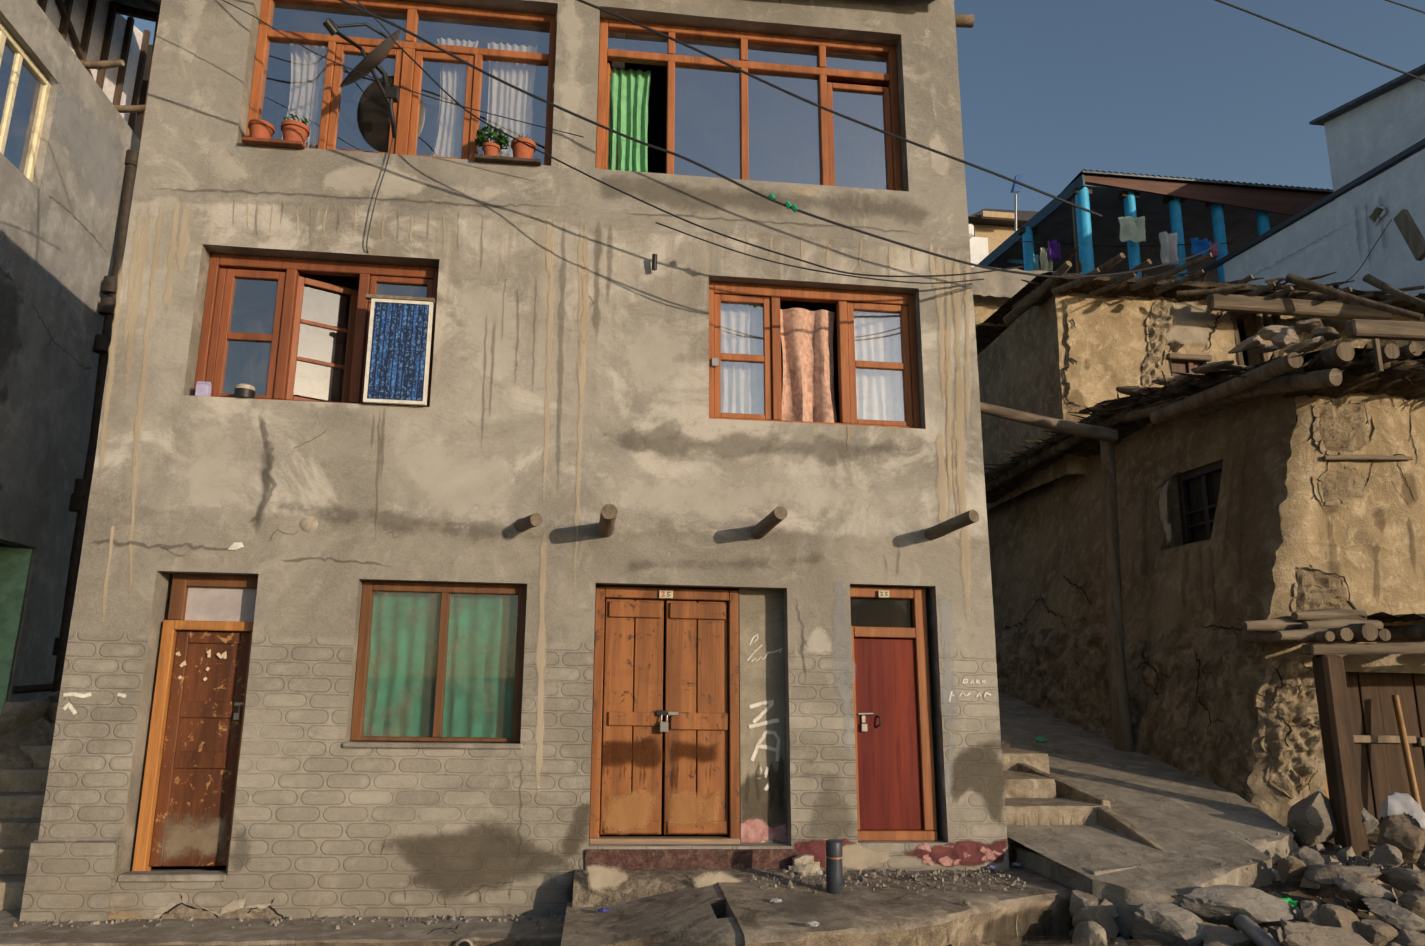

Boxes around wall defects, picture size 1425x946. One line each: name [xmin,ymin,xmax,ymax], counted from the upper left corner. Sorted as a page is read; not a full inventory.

water stain [325,165,424,232]
water stain [468,186,505,200]
water stain [459,282,522,381]
water stain [574,232,588,553]
crack [1062,310,1081,407]
peeling [1141,297,1214,387]
peeling [1290,565,1360,612]
water stain [536,543,546,777]
crack [1269,668,1320,760]
water stain [381,804,590,906]